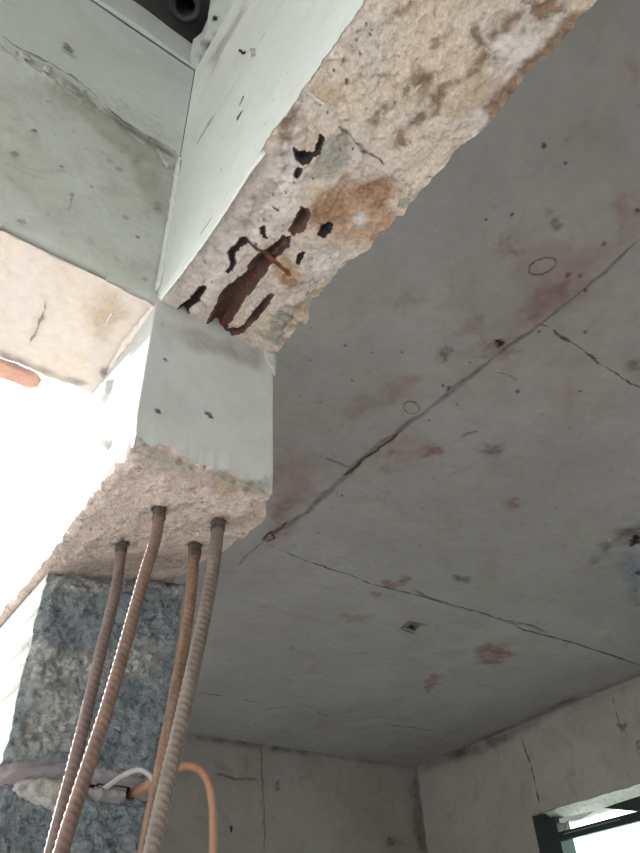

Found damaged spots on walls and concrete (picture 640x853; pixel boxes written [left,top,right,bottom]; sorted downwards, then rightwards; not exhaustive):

spalling [106,134,348,376]
crack [245,238,289,255]
crack [30,300,46,341]
crack [541,324,640,388]
crack [345,430,402,475]
spalling [0,442,272,628]
crack [262,522,638,665]
crack [521,737,540,804]